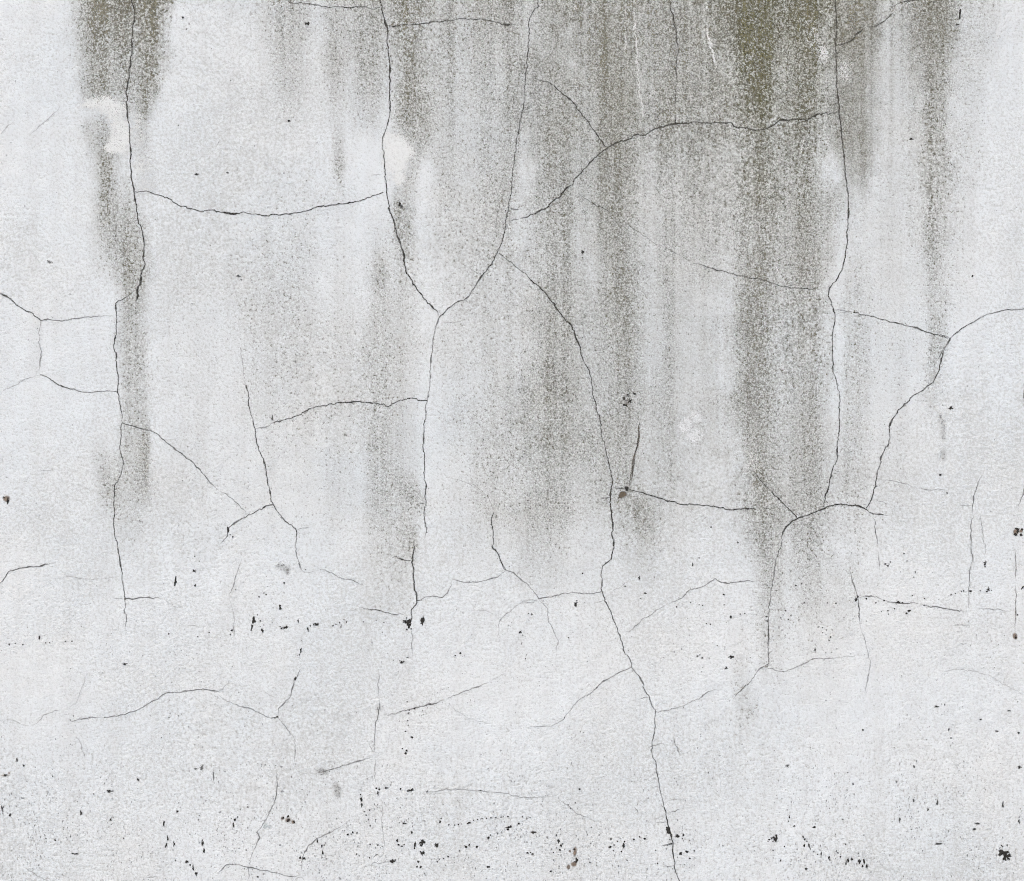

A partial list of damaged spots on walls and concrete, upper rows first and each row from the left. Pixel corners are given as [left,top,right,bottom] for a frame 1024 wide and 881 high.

water stain [88,124,146,388]
water stain [77,0,174,120]
crack [2,0,1021,695]
crack [516,267,754,881]
water stain [350,0,967,576]